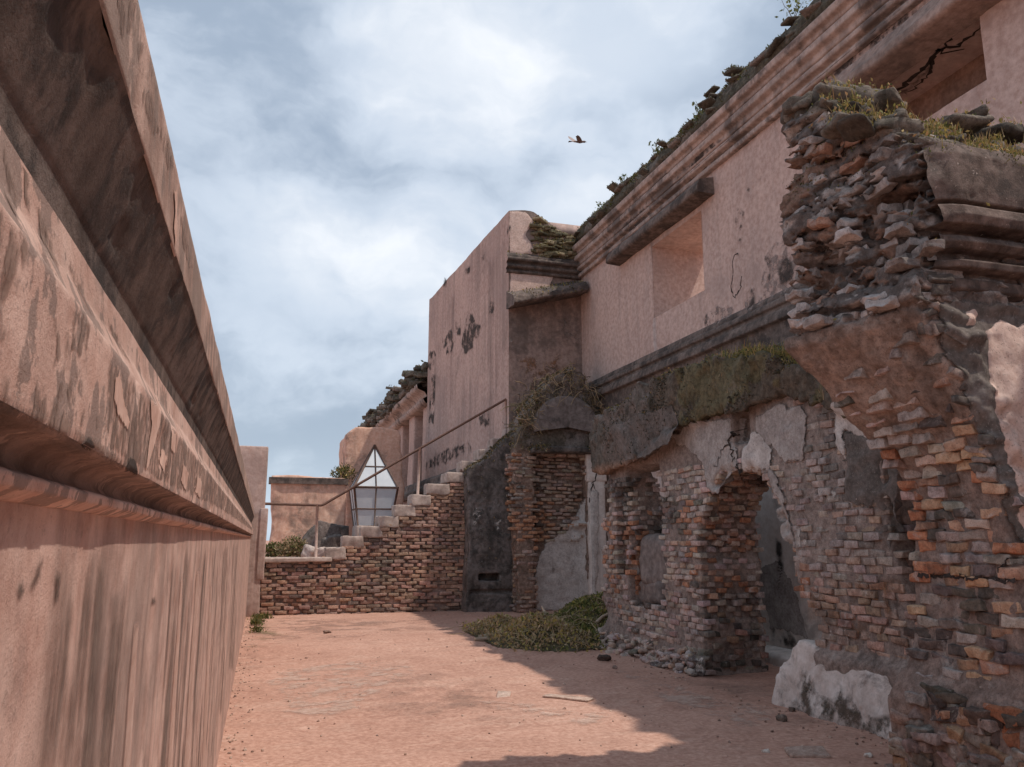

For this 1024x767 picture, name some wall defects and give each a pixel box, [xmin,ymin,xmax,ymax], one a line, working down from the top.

crack [896,27,981,94]
leakage [428,314,480,423]
crack [714,428,747,474]